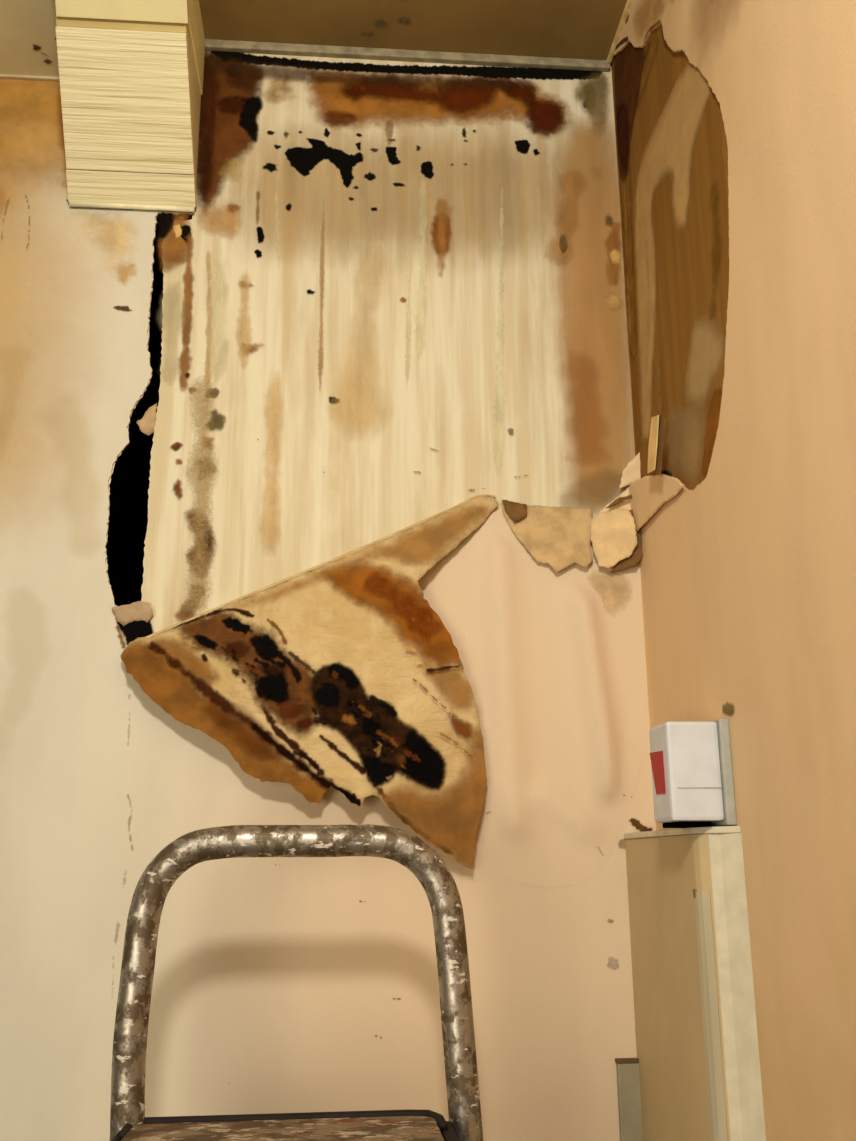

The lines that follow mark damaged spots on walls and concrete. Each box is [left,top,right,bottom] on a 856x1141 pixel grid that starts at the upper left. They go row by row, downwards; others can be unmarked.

damp [0,79,66,172]
damp [239,97,400,200]
damp [417,146,434,179]
damp [515,139,540,155]
damp [255,227,264,258]
damp [307,216,324,383]
flaking render [127,25,729,633]
damp [559,39,658,502]
damp [593,575,628,609]